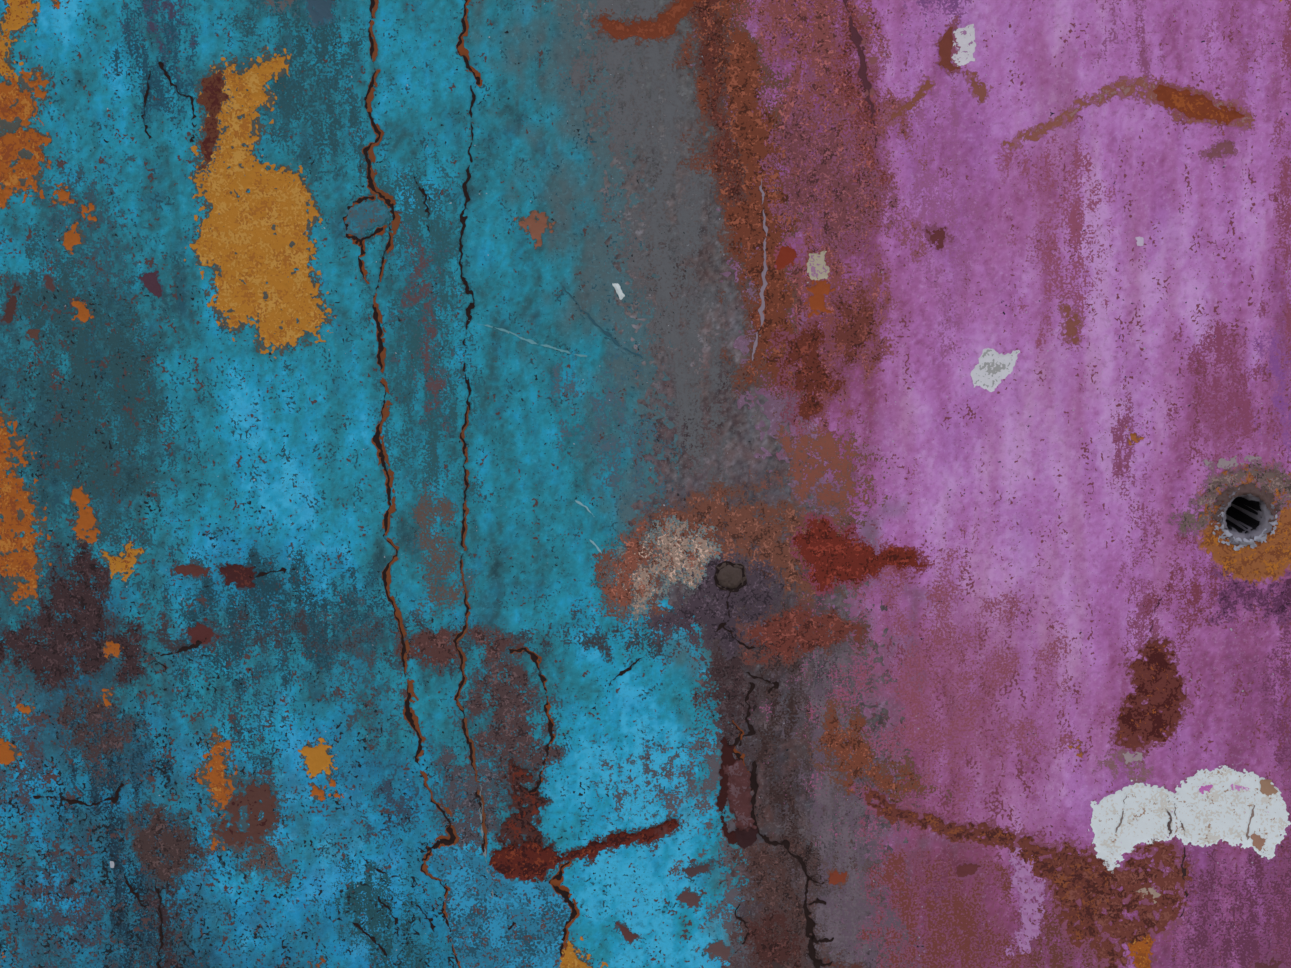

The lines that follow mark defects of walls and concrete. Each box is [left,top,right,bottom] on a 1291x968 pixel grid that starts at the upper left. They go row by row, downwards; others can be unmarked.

peeling [0,0,163,330]
peeling [115,0,337,360]
rust [1003,72,1255,164]
crack [4,0,516,968]
rust [0,25,655,968]
rust [571,0,1134,968]
crack [509,647,556,794]
crack [539,861,580,958]
spalling [489,722,777,968]
crack [716,592,834,968]
rust [1090,631,1195,785]
spalling [1004,751,1291,968]